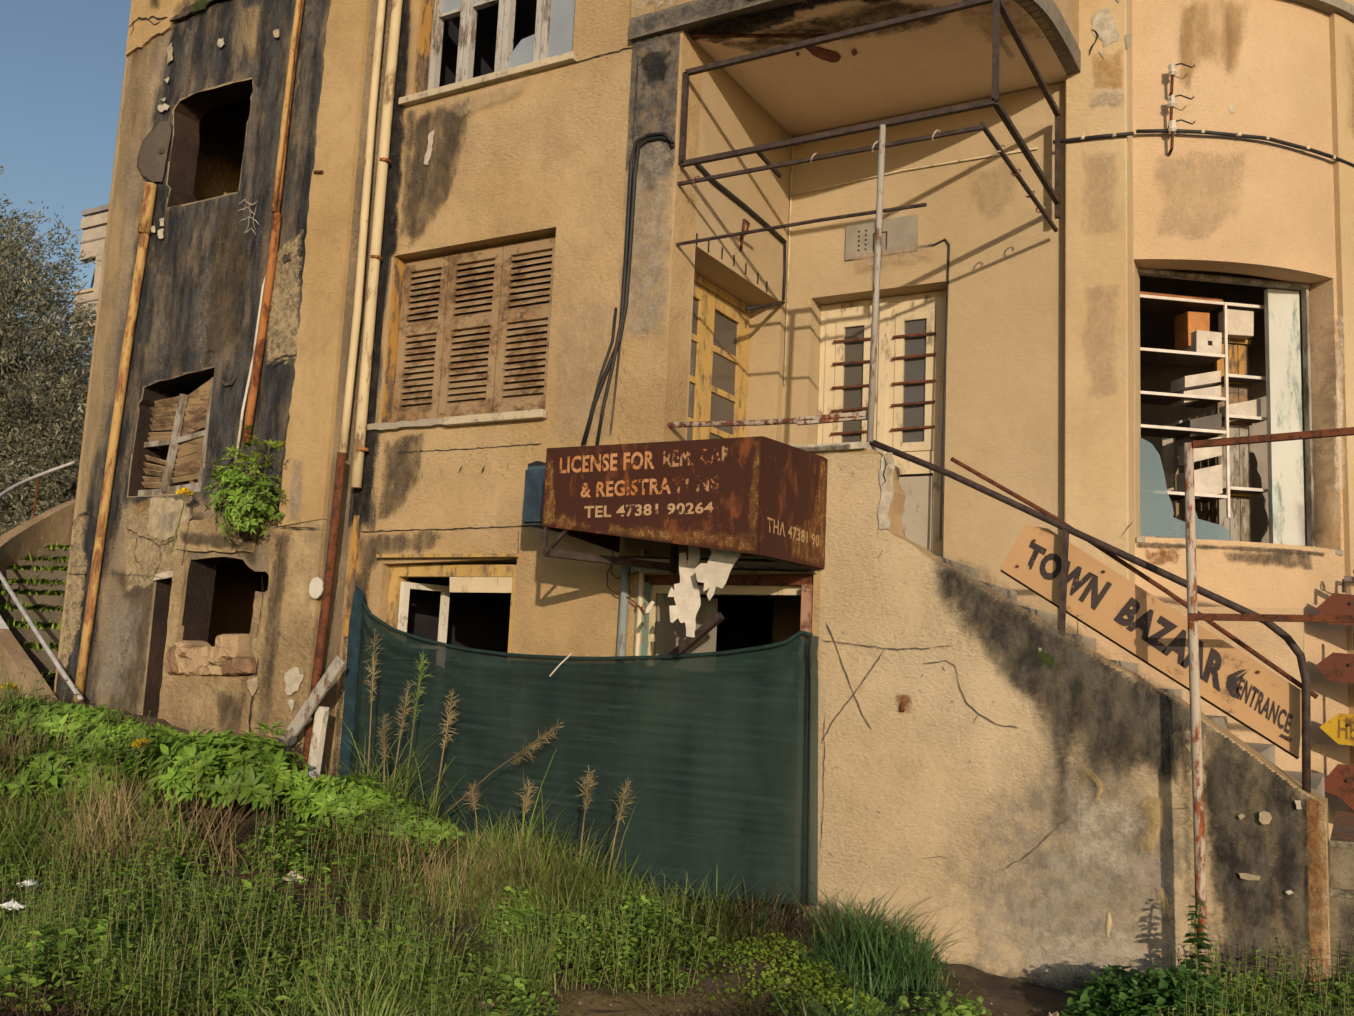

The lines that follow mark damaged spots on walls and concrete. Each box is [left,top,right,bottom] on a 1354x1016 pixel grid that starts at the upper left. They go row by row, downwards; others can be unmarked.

spalling [169,0,216,22]
leakage [626,0,944,331]
leakage [348,0,469,604]
peeling [147,497,192,541]
rust [897,695,910,712]
crack [823,640,1017,728]
leakage [939,560,1312,1002]